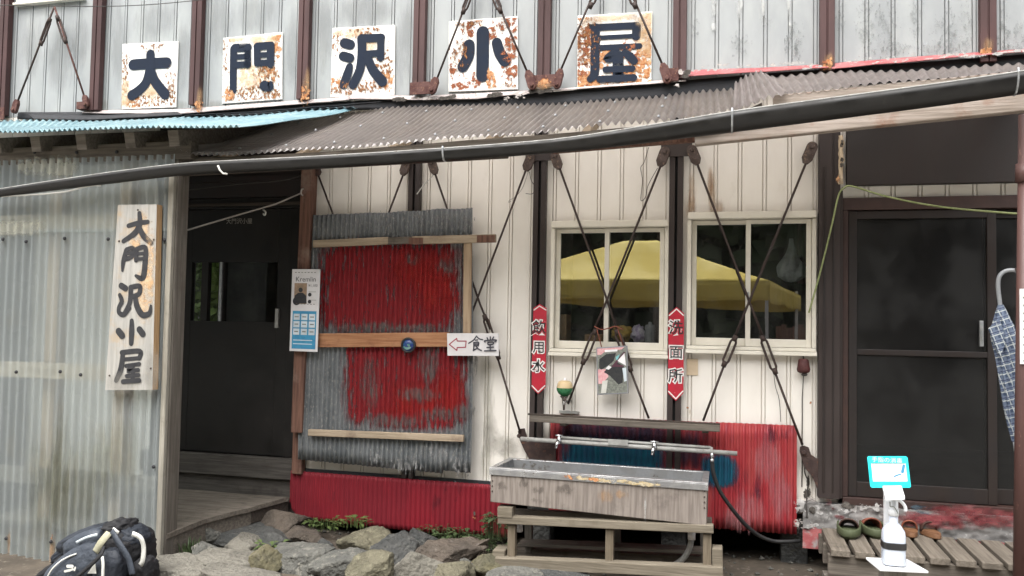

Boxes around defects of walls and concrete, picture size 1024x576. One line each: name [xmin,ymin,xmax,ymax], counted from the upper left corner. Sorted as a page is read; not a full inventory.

rust [122,43,176,108]
rust [222,34,282,101]
rust [331,26,394,96]
rust [449,18,517,90]
rust [577,12,652,89]
peeling [339,322,430,333]
peeling [364,347,474,427]